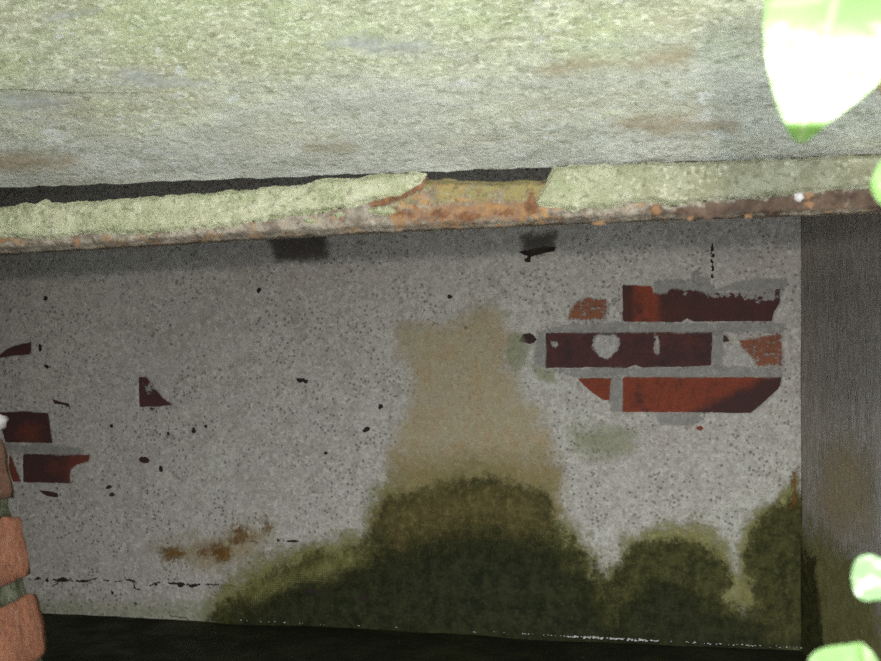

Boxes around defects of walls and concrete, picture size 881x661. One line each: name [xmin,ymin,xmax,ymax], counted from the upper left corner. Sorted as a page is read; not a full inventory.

rust [649,189,879,221]
spalling [0,342,42,358]
spalling [519,279,786,431]
spalling [139,377,172,410]
water stain [393,313,557,517]
spalling [0,411,90,497]
rust [160,547,185,561]
rust [198,526,253,561]
crack [29,576,235,605]